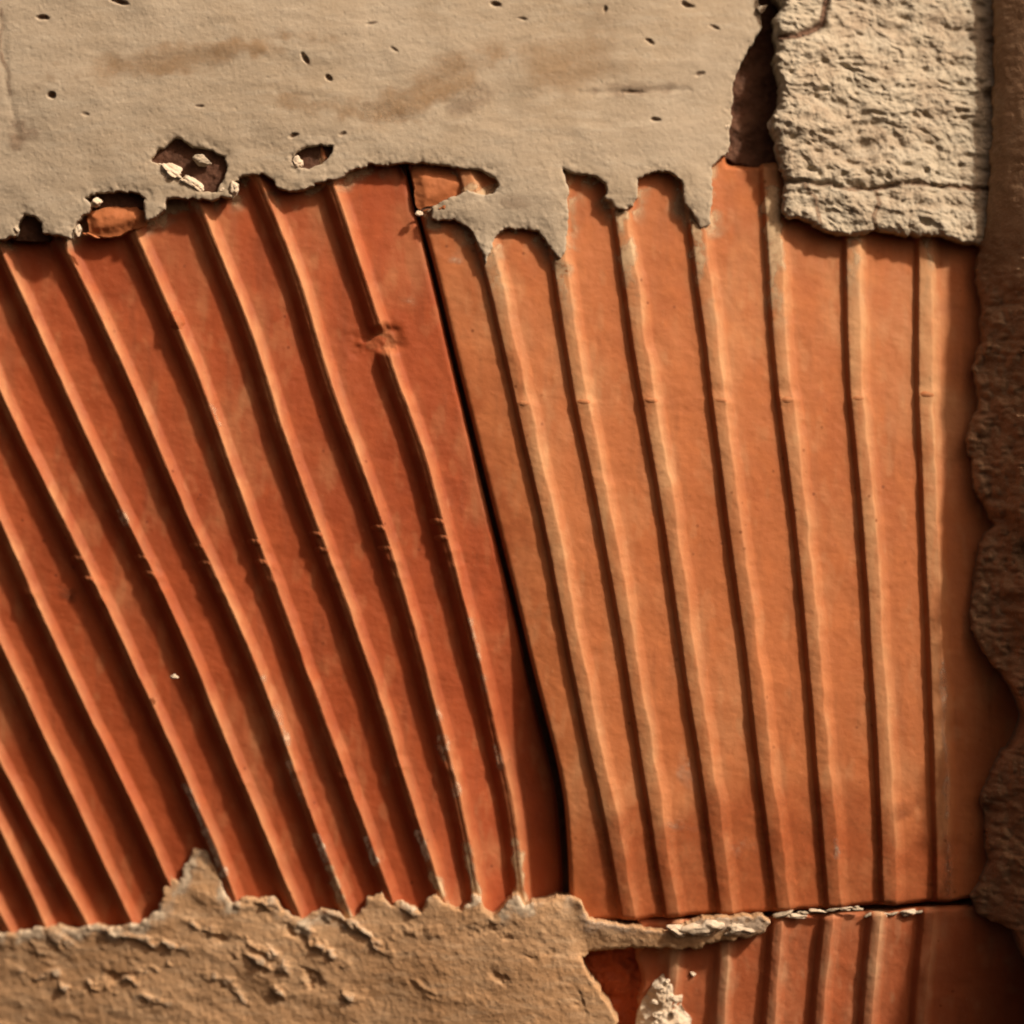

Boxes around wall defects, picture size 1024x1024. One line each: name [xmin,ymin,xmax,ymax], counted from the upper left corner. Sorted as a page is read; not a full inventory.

flaking render [152,139,239,201]
spalling [411,166,461,217]
spalling [74,192,147,239]
flaking render [13,216,51,243]
crack [399,165,569,894]
peeling [786,906,864,919]
peeling [884,909,923,917]
peeling [666,924,685,938]
peeling [724,923,756,936]